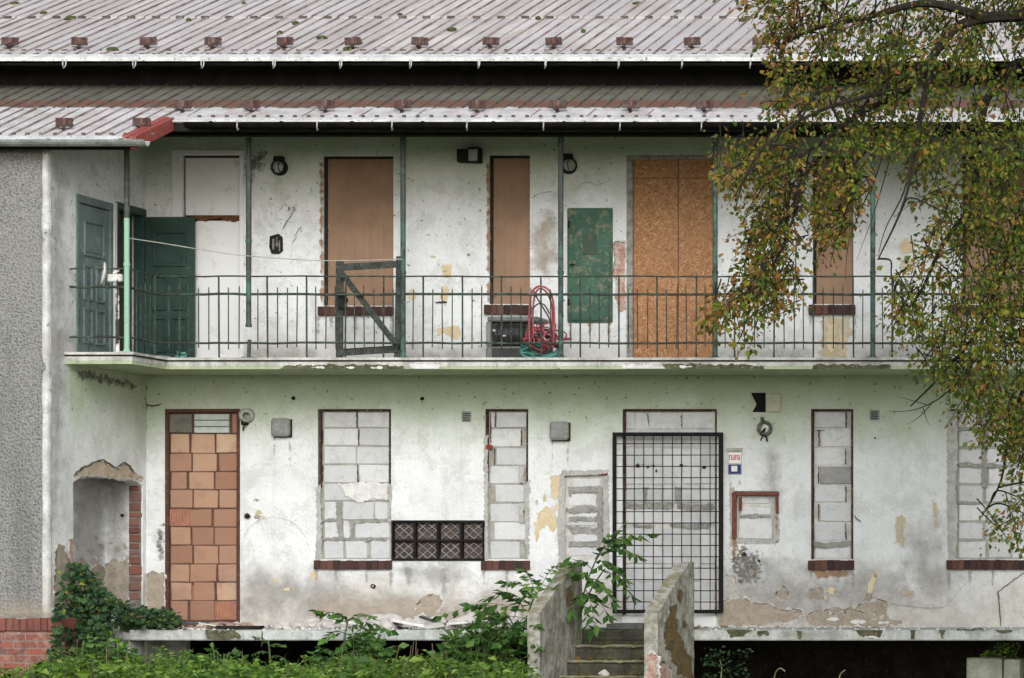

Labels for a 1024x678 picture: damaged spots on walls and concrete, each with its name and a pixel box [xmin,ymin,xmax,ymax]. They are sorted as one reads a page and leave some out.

spalling [613,240,627,312]
water stain [77,370,148,391]
spalling [73,459,144,482]
peeling [534,475,560,542]
peeling [52,536,132,615]
spalling [146,570,167,610]
spalling [414,593,444,618]
peeling [644,589,694,678]
spalling [717,570,905,639]
crack [956,573,1024,631]